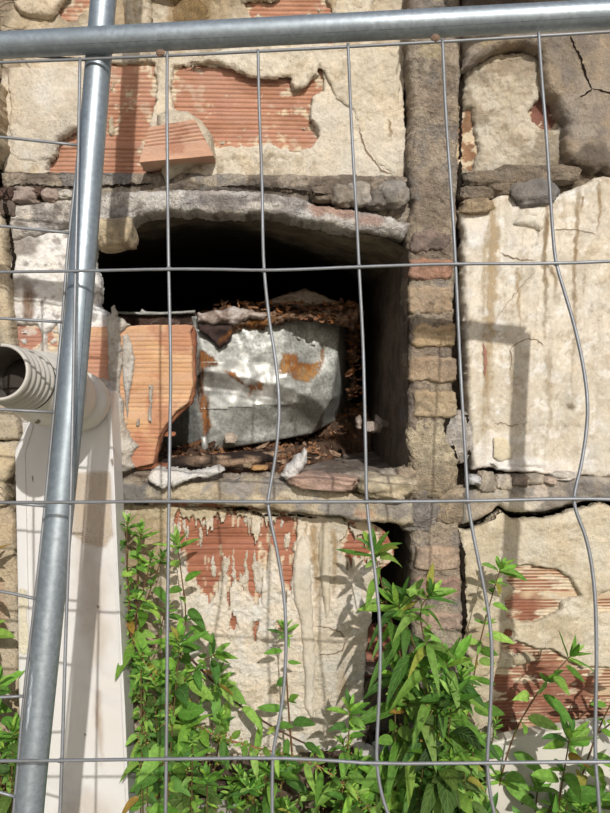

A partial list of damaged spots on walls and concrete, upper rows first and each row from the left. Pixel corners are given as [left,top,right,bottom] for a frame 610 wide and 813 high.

flaking render [103,63,324,182]
crack [456,47,464,200]
flaking render [456,106,478,175]
flaking render [528,98,559,130]
crack [570,36,610,97]
leakage [484,210,499,379]
leakage [542,214,557,284]
flaking render [147,499,306,630]
flaking render [340,519,394,569]
crack [460,501,610,656]
flaking render [504,564,579,622]
flaking render [492,629,610,734]